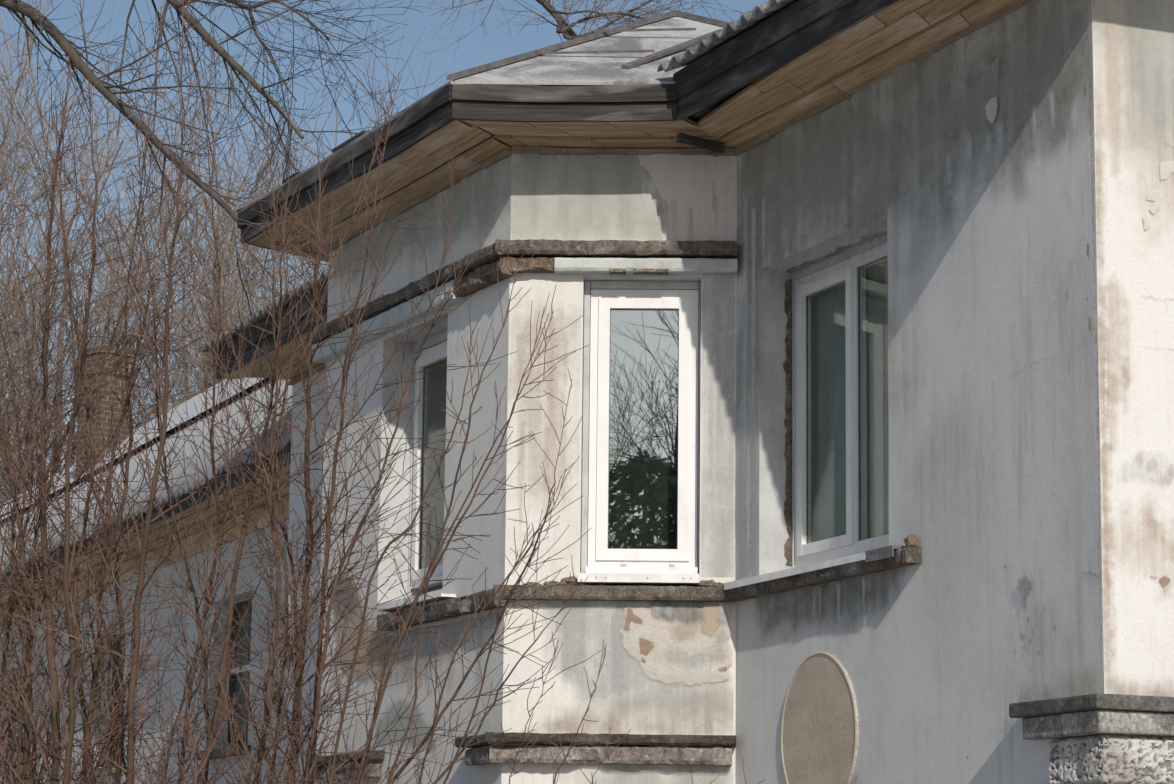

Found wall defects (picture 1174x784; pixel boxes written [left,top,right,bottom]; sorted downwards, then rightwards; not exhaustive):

peeling [985,97,997,124]
damp [1128,0,1174,138]
damp [334,153,662,273]
damp [703,0,1096,580]
spalling [783,231,887,565]
spalling [620,601,733,685]